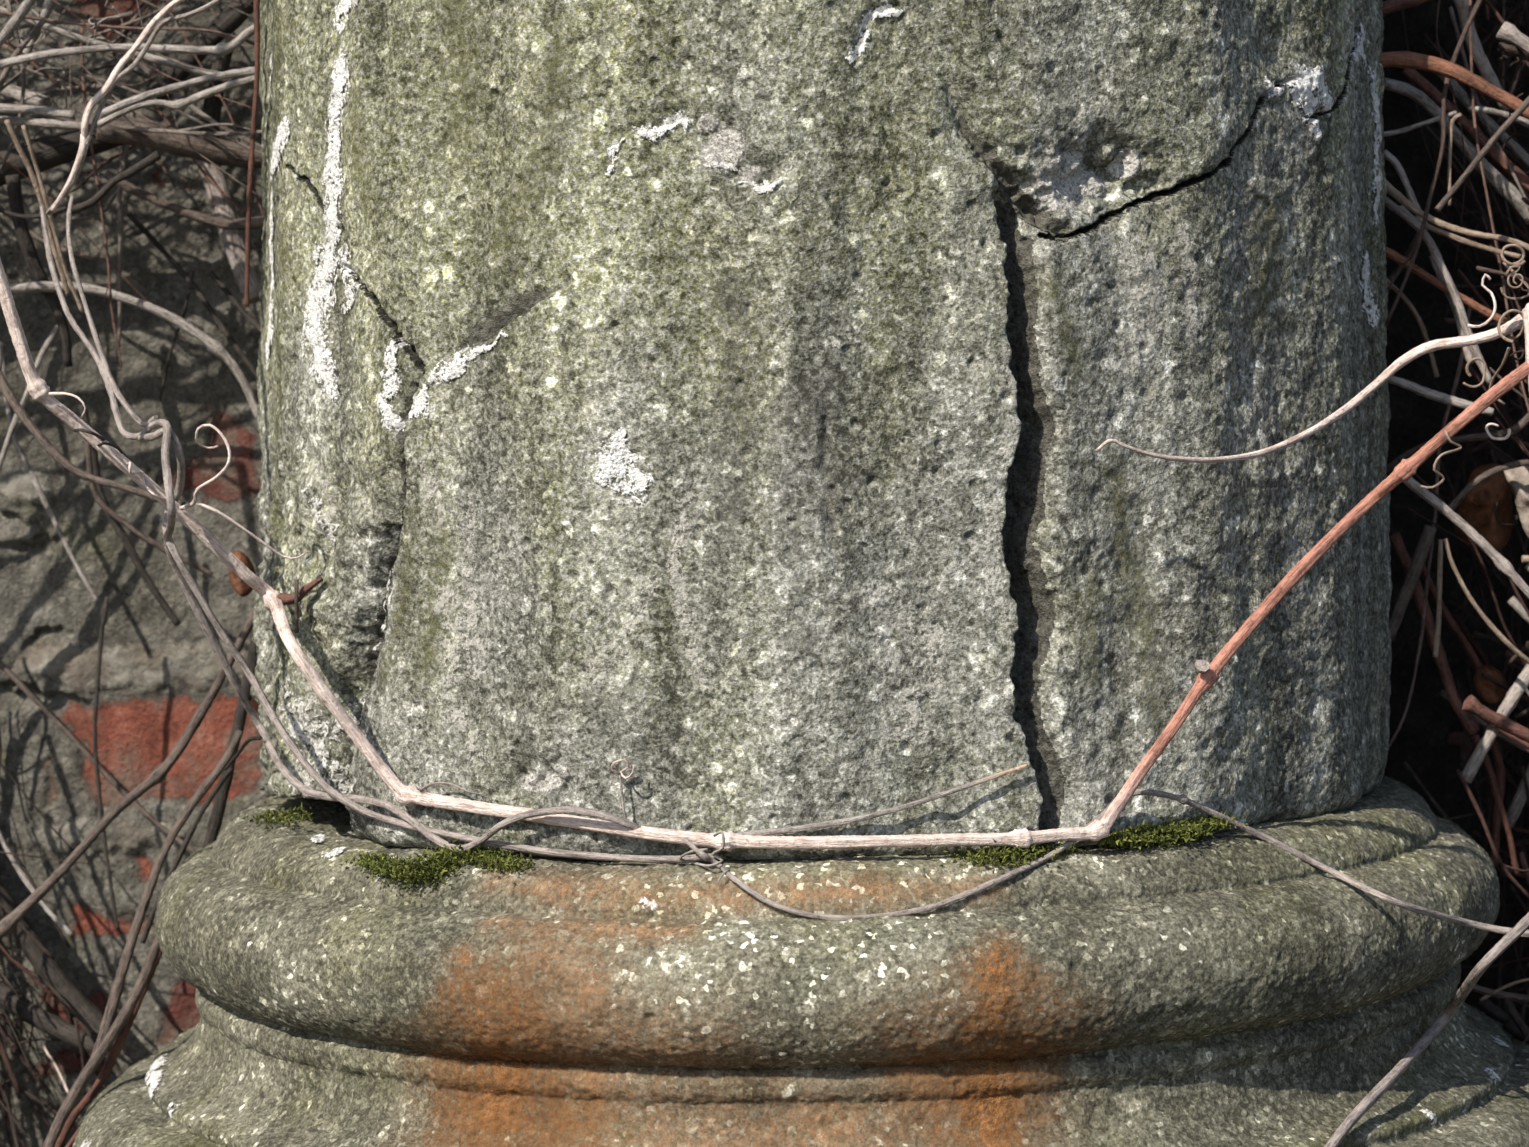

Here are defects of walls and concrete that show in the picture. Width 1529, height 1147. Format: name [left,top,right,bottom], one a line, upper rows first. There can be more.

crack [1307,27,1357,118]
crack [285,164,326,210]
crack [342,271,550,791]
crack [958,76,1296,847]
rust [959,941,1036,1147]